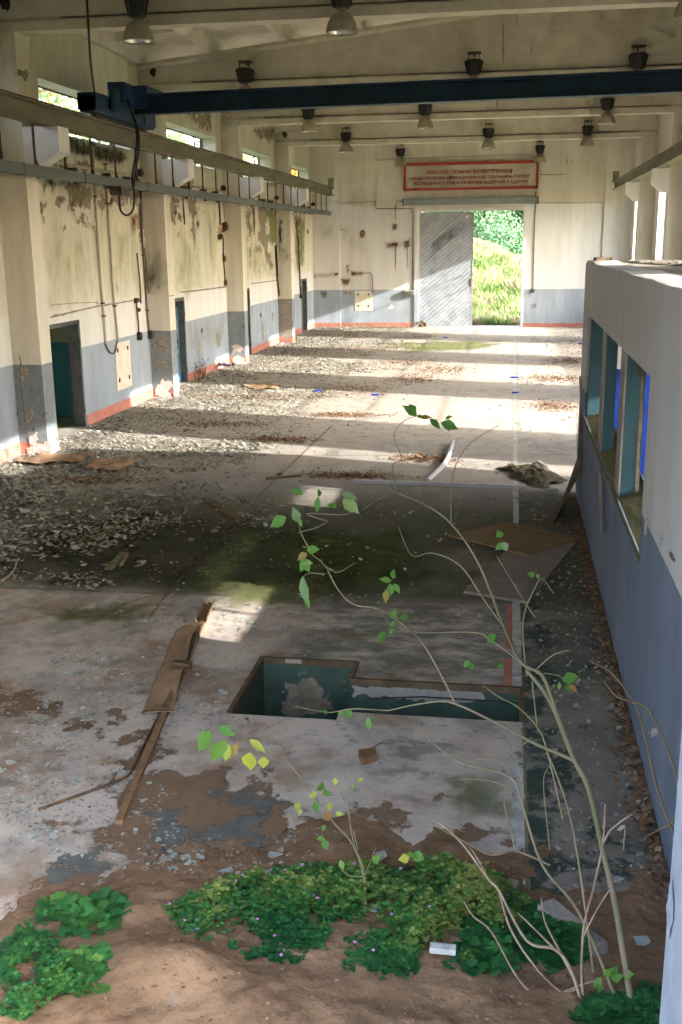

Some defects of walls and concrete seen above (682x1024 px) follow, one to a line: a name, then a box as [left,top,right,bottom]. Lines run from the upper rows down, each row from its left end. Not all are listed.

spalling [280,299,294,341]
spalling [154,335,179,397]
spalling [232,344,247,364]